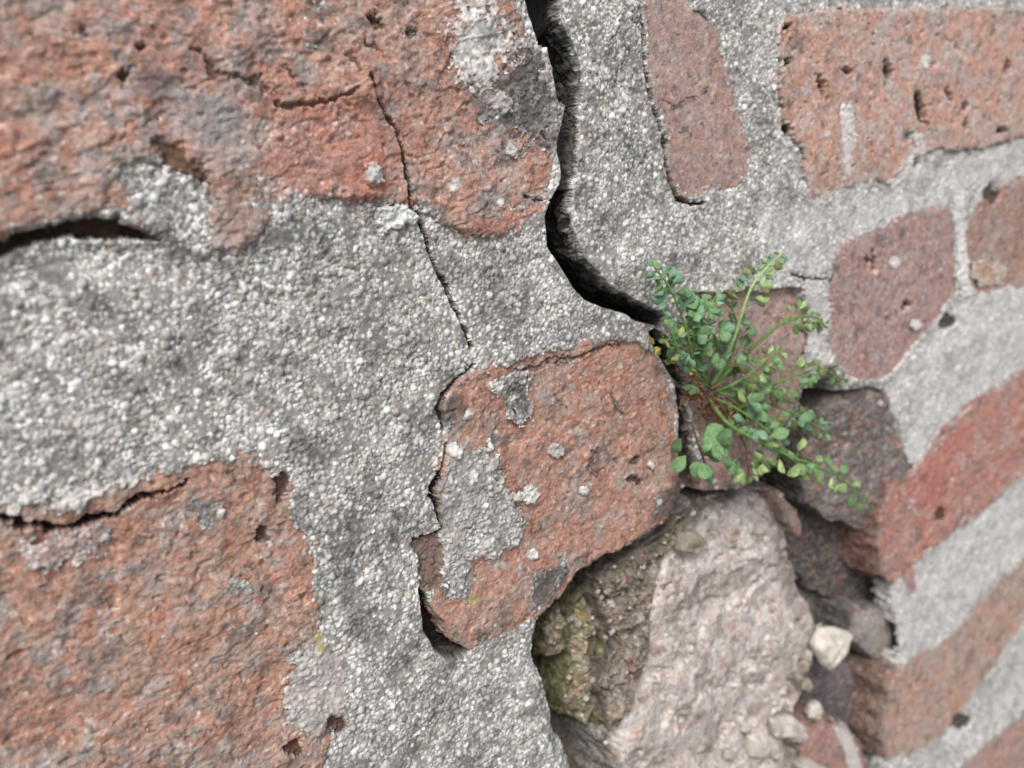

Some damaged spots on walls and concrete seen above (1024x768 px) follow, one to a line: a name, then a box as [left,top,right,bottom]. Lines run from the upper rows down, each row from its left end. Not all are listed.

spalling [366,13,384,30]
spalling [151,139,207,181]
spalling [237,66,410,224]
spalling [460,193,552,246]
crack [516,0,690,465]
crack [189,39,473,543]
crack [0,478,187,532]
spalling [273,471,289,502]
spalling [256,525,270,542]
spalling [410,531,445,592]
crack [420,600,460,649]
spalling [281,738,302,757]